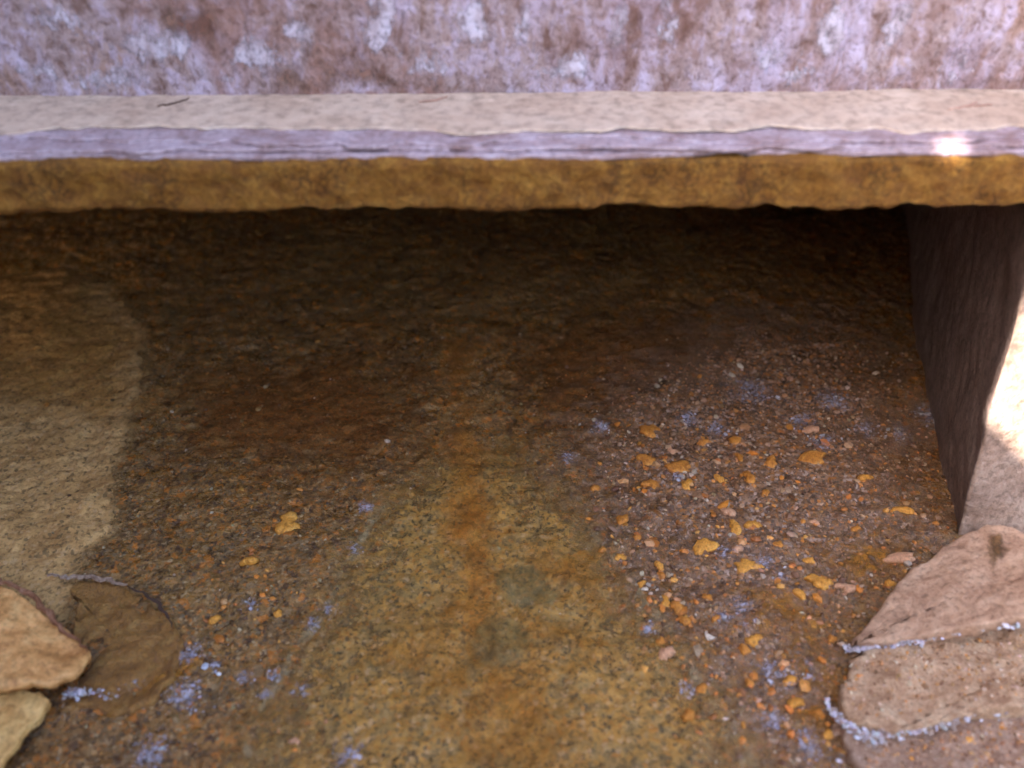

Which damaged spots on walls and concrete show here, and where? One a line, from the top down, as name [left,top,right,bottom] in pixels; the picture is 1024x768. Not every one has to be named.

damp [675,410,738,437]
damp [736,376,934,451]
damp [759,660,815,689]
damp [792,728,842,766]